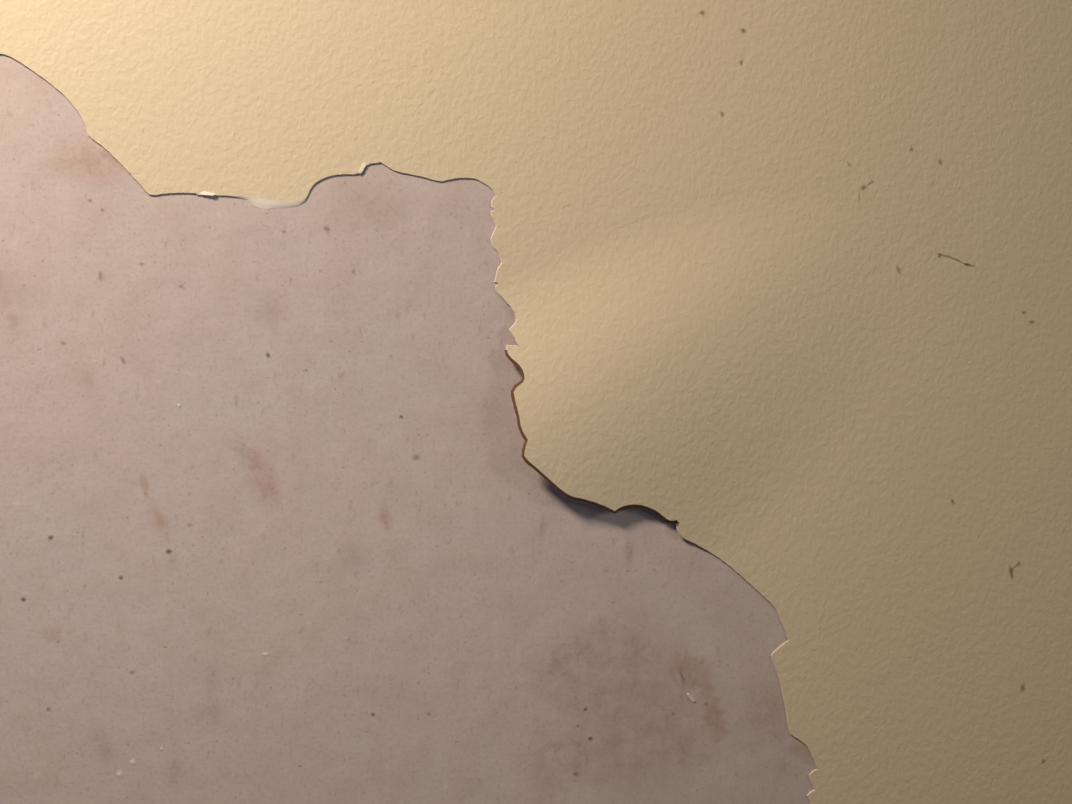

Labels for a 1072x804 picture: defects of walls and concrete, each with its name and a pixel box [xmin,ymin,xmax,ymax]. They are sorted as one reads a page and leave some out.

peeling [0,54,907,804]